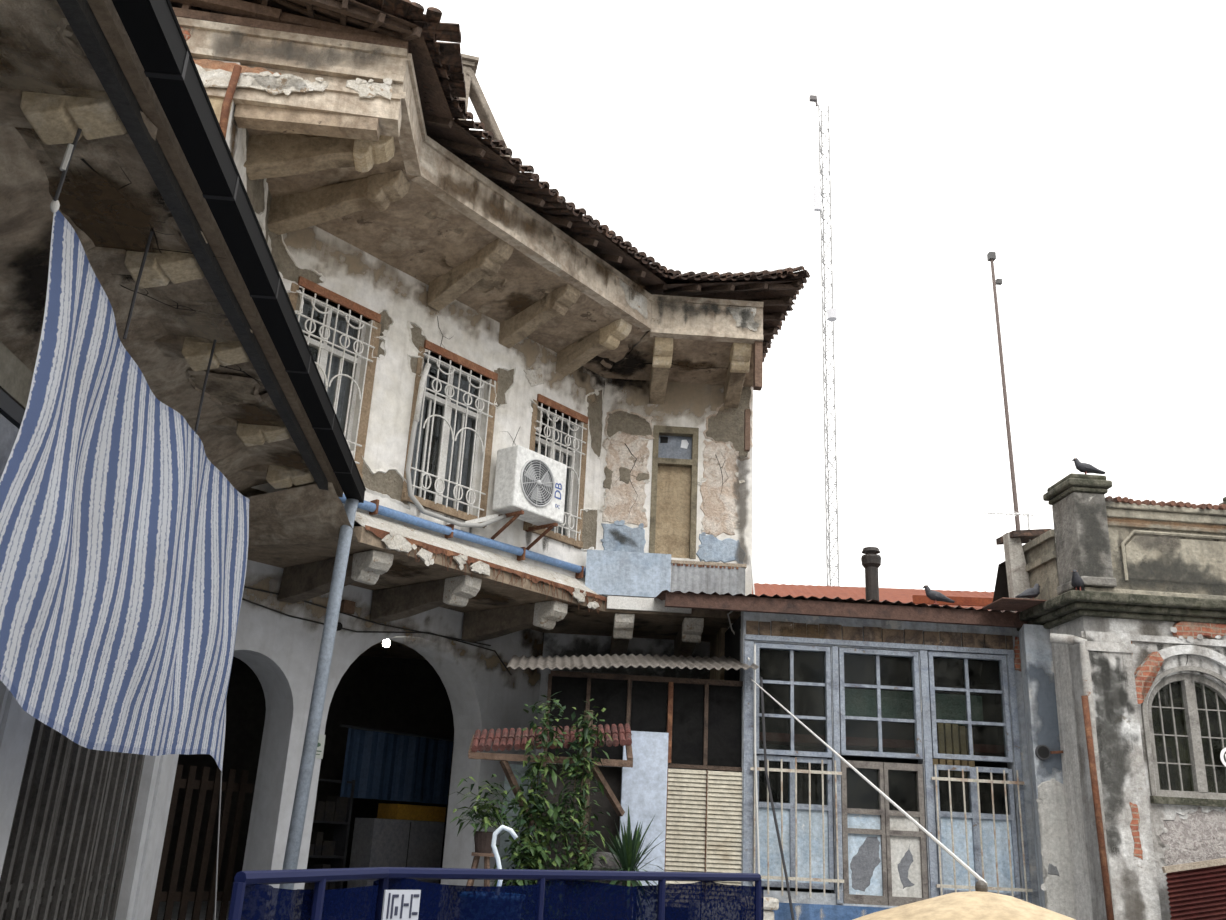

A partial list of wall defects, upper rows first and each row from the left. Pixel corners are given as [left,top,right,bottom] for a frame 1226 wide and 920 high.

peeling [193,59,329,95]
peeling [345,78,392,100]
spalling [242,128,326,314]
peeling [578,388,654,553]
peeling [696,386,753,564]
leakage [1074,498,1226,596]
flaking render [1170,616,1226,643]
flaking render [1131,641,1164,704]
leakage [1088,620,1226,854]
flaking render [1130,802,1143,860]
spalling [1155,806,1226,866]
leakage [1124,876,1145,920]